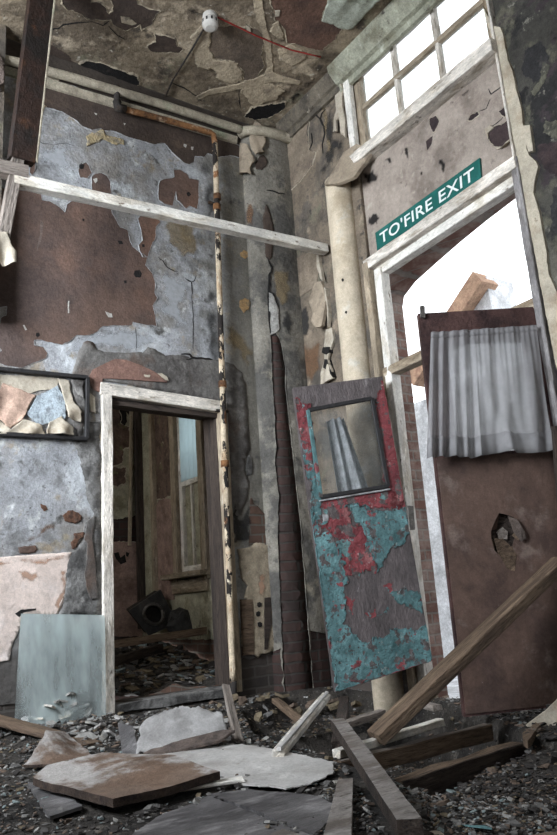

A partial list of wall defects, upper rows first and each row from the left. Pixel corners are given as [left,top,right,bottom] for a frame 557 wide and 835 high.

peeling [60,0,185,54]
peeling [206,24,266,81]
peeling [269,0,343,51]
peeling [44,85,239,210]
spalling [244,100,287,120]
peeling [485,107,510,150]
peeling [0,190,160,369]
crack [159,258,217,361]
peeling [112,409,129,489]
spalling [58,393,102,616]
flaking render [113,516,136,542]
flaking render [269,293,314,692]